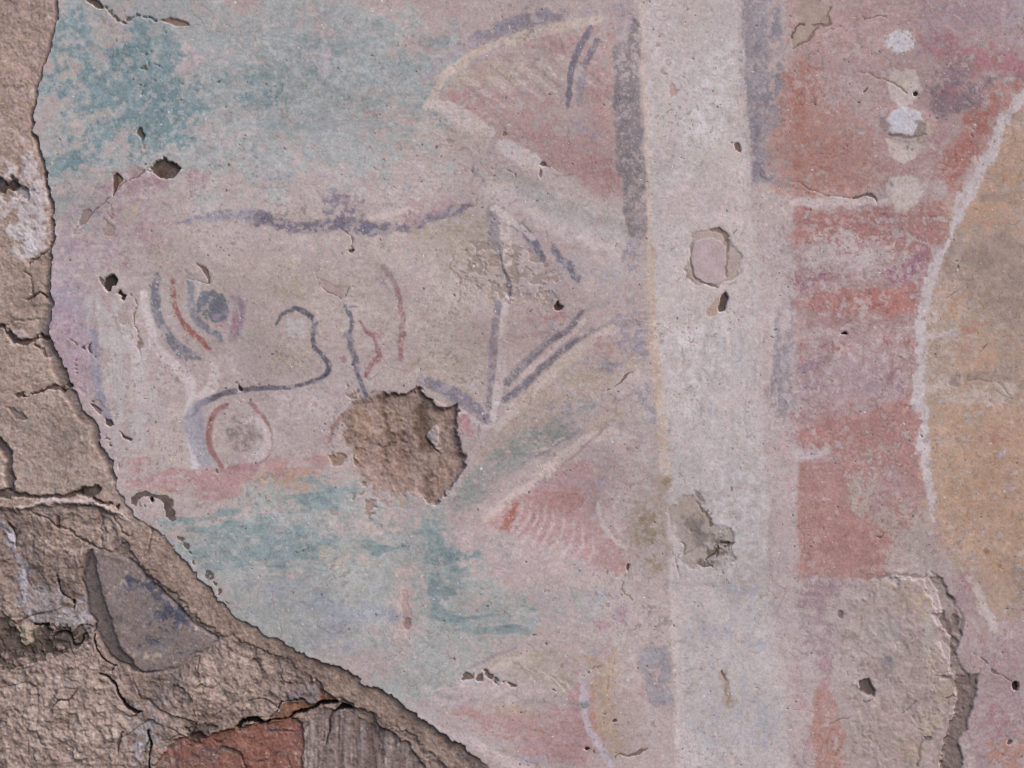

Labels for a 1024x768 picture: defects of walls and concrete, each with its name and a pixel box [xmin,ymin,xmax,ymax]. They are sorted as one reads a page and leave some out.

peeling [787,0,841,54]
spalling [690,229,743,317]
spalling [0,0,490,768]
crack [0,437,153,557]
peeling [667,491,737,581]
crack [52,690,77,707]
crack [93,629,153,768]
crack [214,698,354,768]